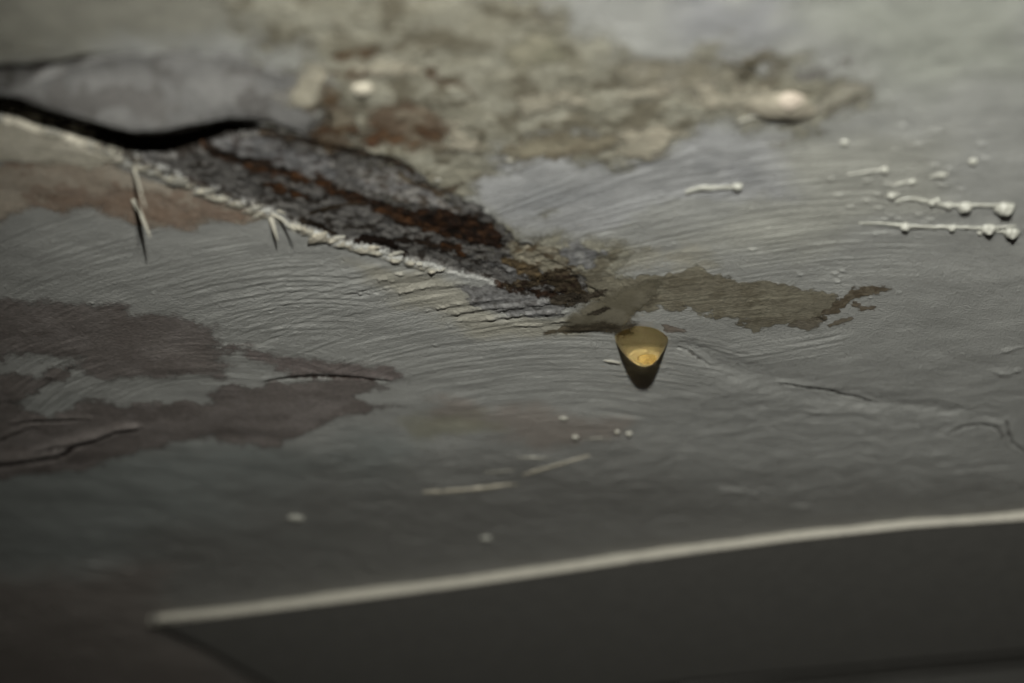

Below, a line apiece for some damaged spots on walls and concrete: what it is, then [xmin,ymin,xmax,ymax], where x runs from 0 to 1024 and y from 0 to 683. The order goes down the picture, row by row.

leakage [0,111,266,231]
crack [0,55,465,208]
spalling [41,120,608,318]
corrosion [200,137,588,305]
leakage [219,0,873,213]
leakage [475,222,890,335]
crack [0,419,108,465]
leakage [0,298,401,480]